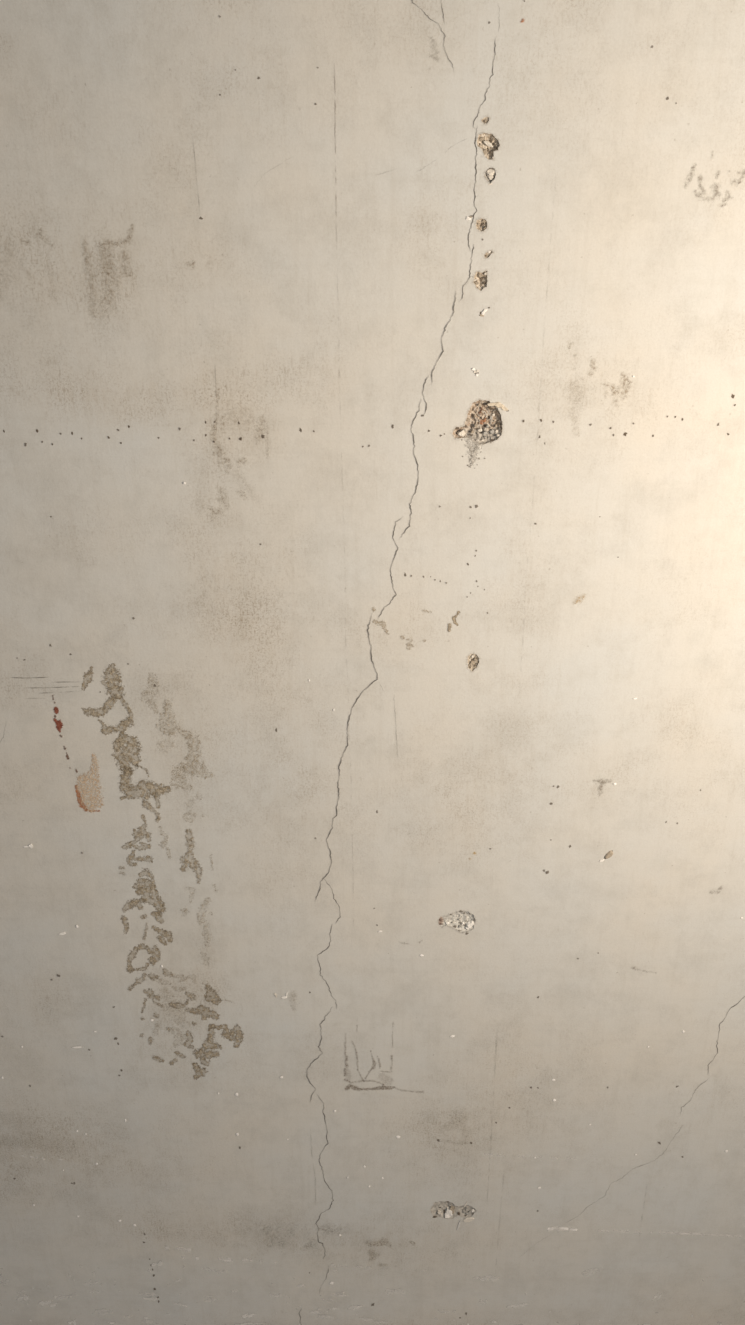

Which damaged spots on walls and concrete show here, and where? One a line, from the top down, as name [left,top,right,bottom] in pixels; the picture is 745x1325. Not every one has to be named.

spalling [428,400,509,468]
peeling [82,664,244,1080]